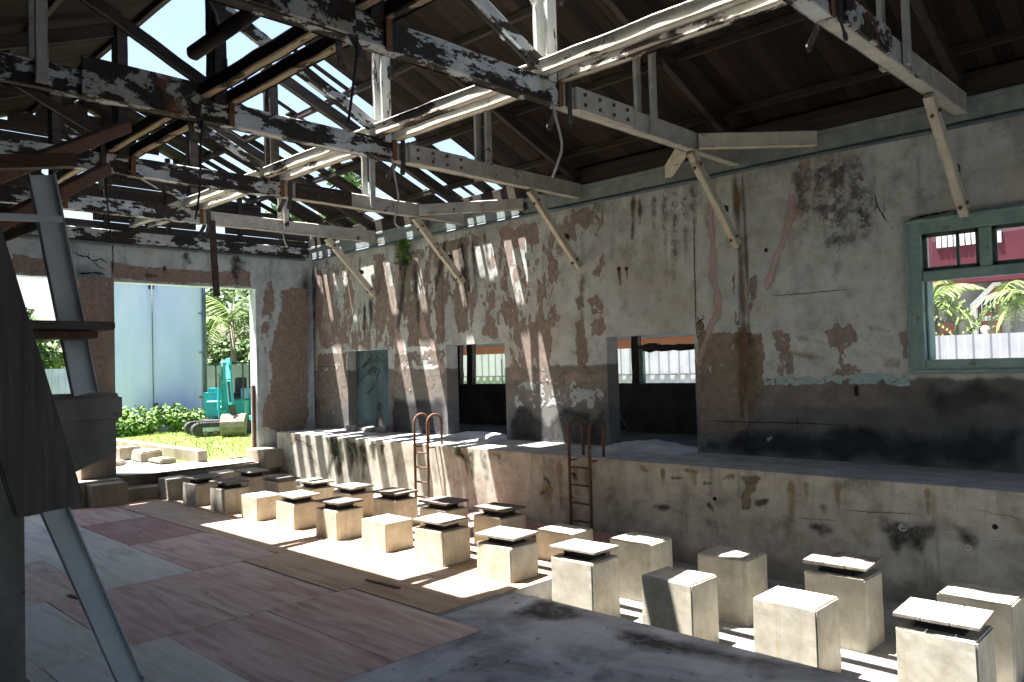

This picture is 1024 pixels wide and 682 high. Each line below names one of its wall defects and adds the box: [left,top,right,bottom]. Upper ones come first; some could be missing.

corrosion [733,179,745,222]
water stain [793,160,872,243]
crack [73,246,114,276]
peeling [592,253,628,277]
peeling [261,203,608,445]
peeling [696,275,795,434]
corrosion [737,235,755,418]
peeling [825,323,862,396]
water stain [708,427,1015,465]
water stain [885,521,948,548]